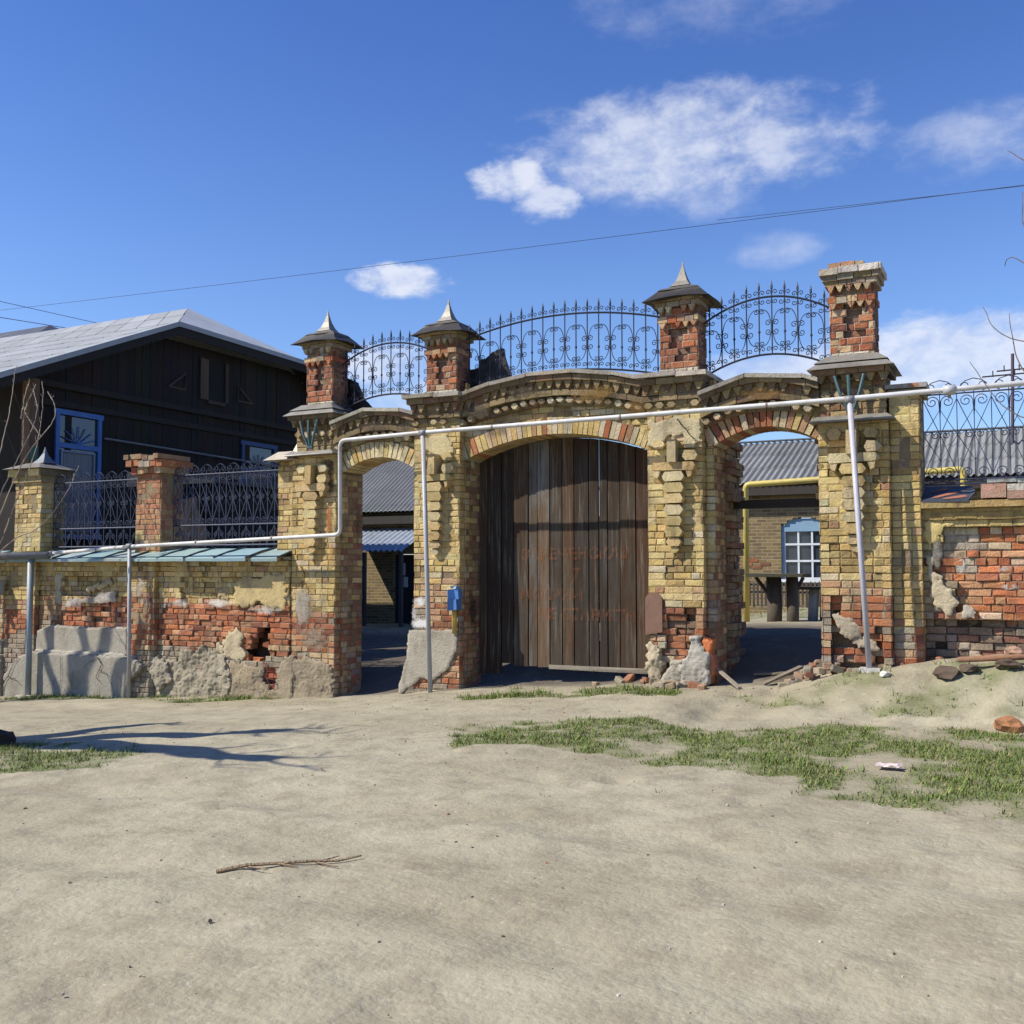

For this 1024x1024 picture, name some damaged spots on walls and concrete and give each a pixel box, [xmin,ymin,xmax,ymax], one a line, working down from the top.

spalling [922,521,1024,621]
spalling [52,573,338,698]
spalling [614,608,718,690]
spalling [778,595,905,687]